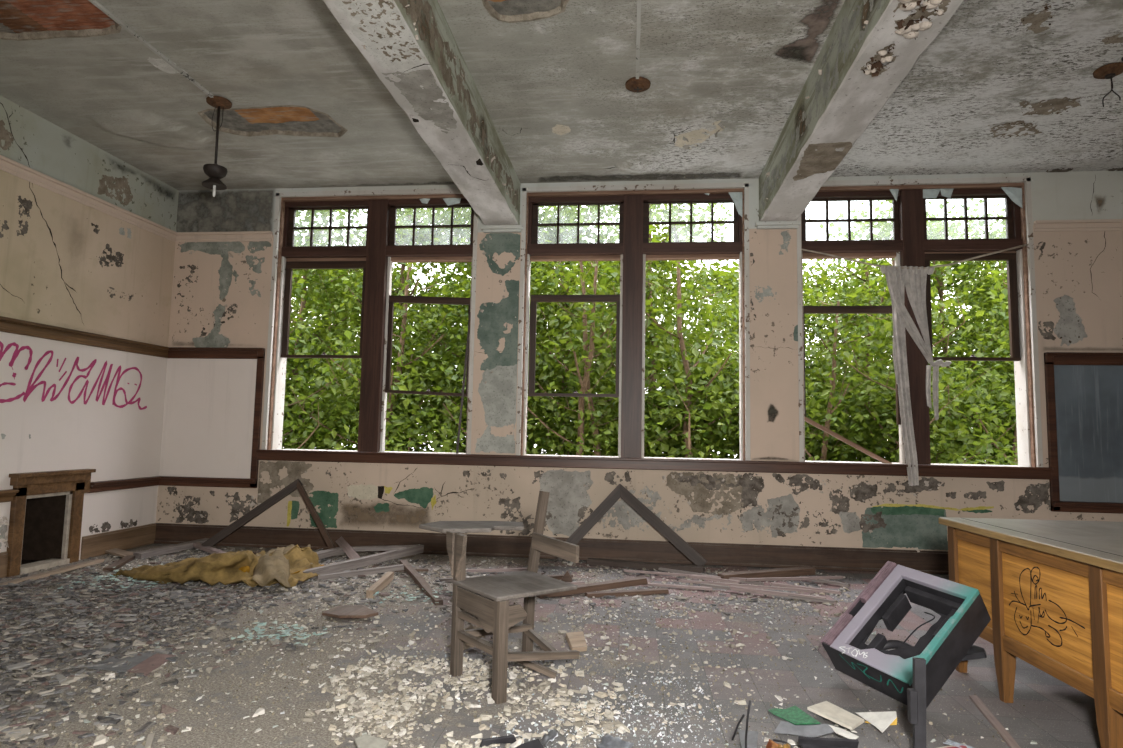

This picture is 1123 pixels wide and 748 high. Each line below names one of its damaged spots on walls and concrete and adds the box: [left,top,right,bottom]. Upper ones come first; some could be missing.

spalling [0,0,122,41]
spalling [482,0,569,23]
spalling [198,105,348,137]
peeling [331,0,520,211]
peeling [988,97,1082,138]
flaking render [793,142,852,181]
crack [0,103,83,323]
peeling [87,218,124,267]
peeling [174,241,272,348]
peeling [475,233,521,454]
peeling [167,460,314,524]
peeling [463,469,873,538]